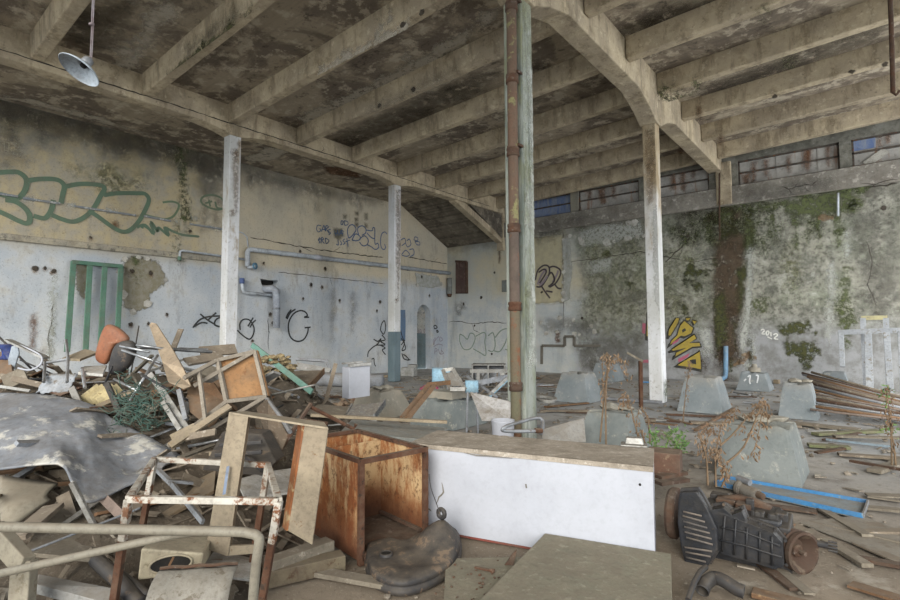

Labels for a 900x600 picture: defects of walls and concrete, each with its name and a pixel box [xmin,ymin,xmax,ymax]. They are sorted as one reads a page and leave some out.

peeling [75,265,87,298]
peeling [116,255,168,327]
water stain [682,203,756,381]